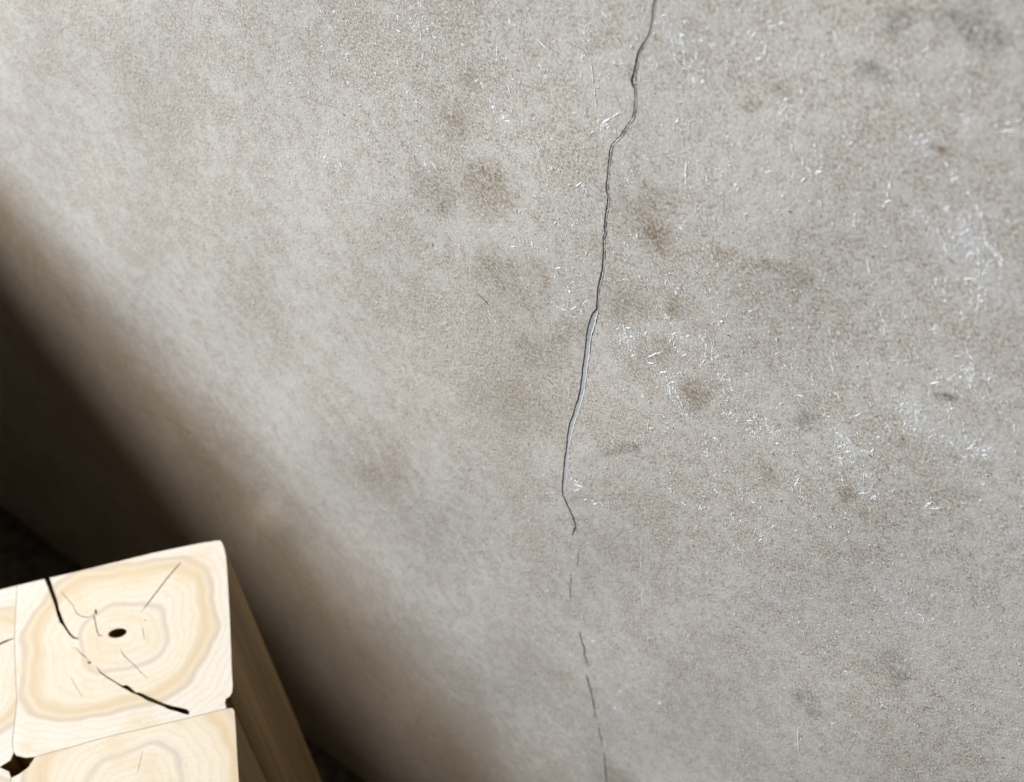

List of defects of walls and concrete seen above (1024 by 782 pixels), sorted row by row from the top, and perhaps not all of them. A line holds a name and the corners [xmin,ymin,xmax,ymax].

crack [562,0,656,599]
crack [579,632,607,782]